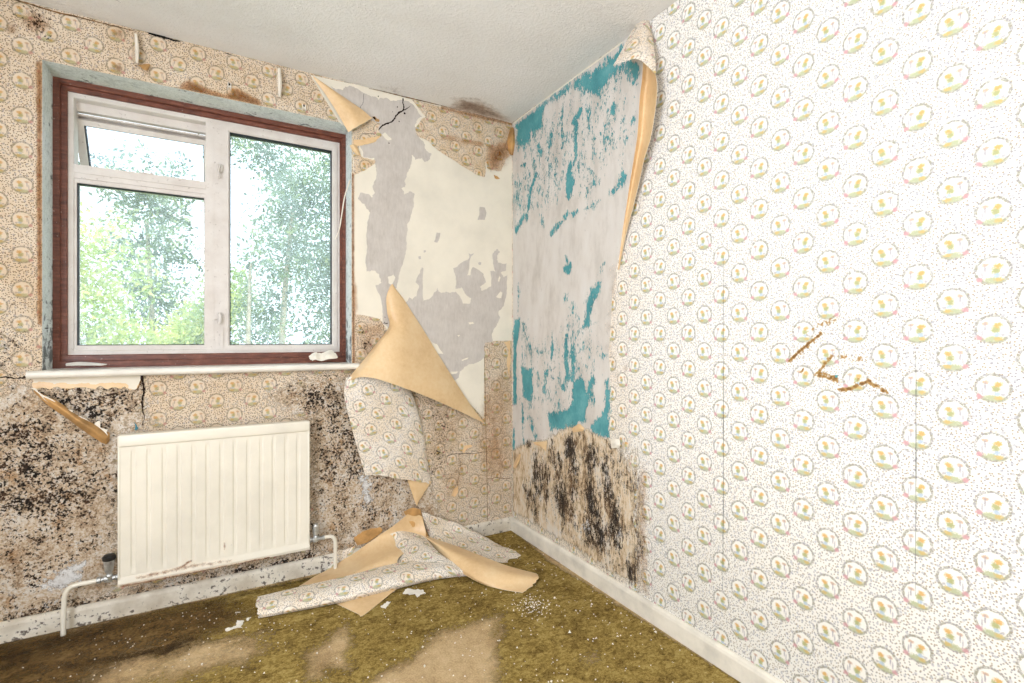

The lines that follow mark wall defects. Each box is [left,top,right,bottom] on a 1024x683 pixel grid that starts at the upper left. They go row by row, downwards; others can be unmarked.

crack [360,88,535,134]
damp [442,101,511,124]
damp [490,143,508,167]
peeling [311,20,658,455]
damp [0,63,456,621]
peeling [32,376,141,390]
crack [135,376,145,426]
damp [512,422,668,587]